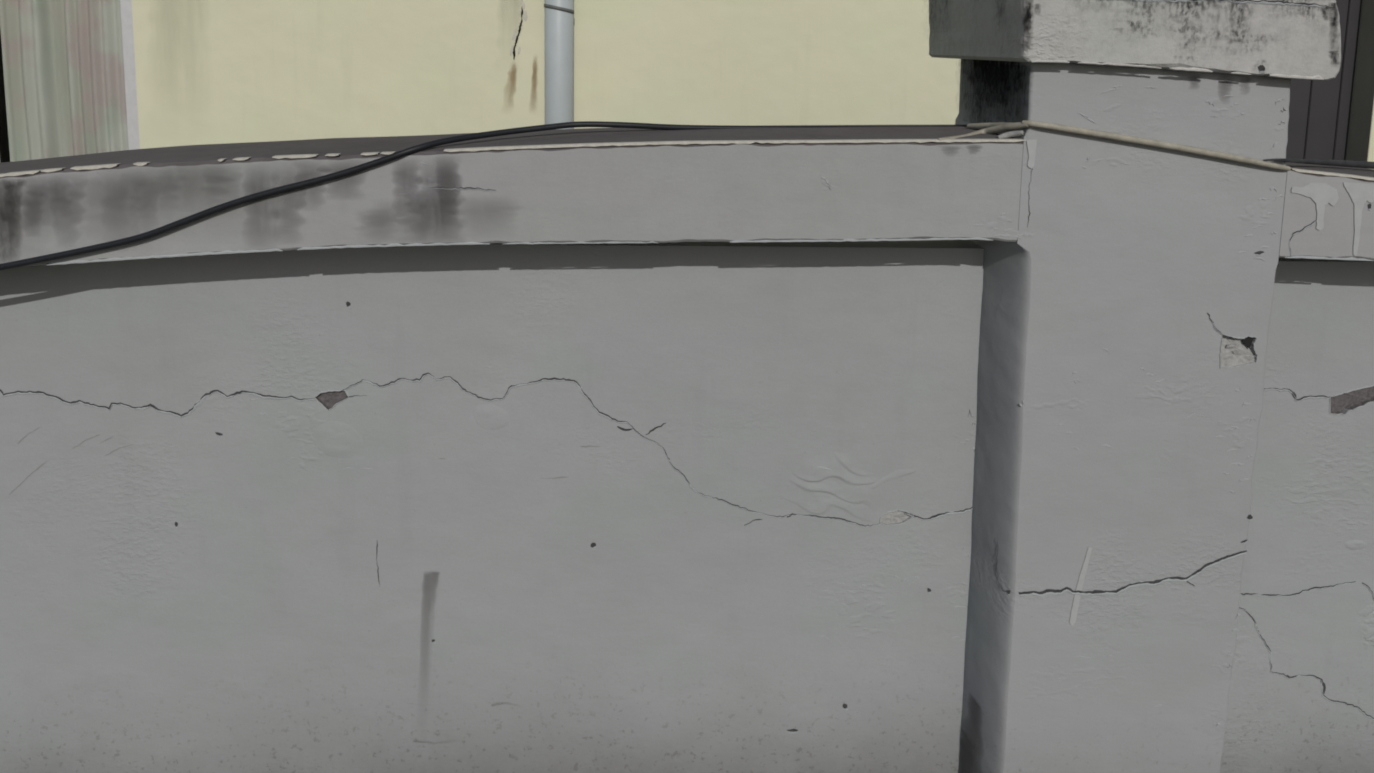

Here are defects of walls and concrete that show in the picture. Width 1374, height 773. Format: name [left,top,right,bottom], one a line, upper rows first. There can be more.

spalling [1219,334,1258,368]
spalling [314,389,349,411]
crack [1264,388,1329,401]
spalling [1329,385,1374,415]
crack [0,373,973,527]
crack [996,542,1247,598]
crack [1239,581,1374,720]